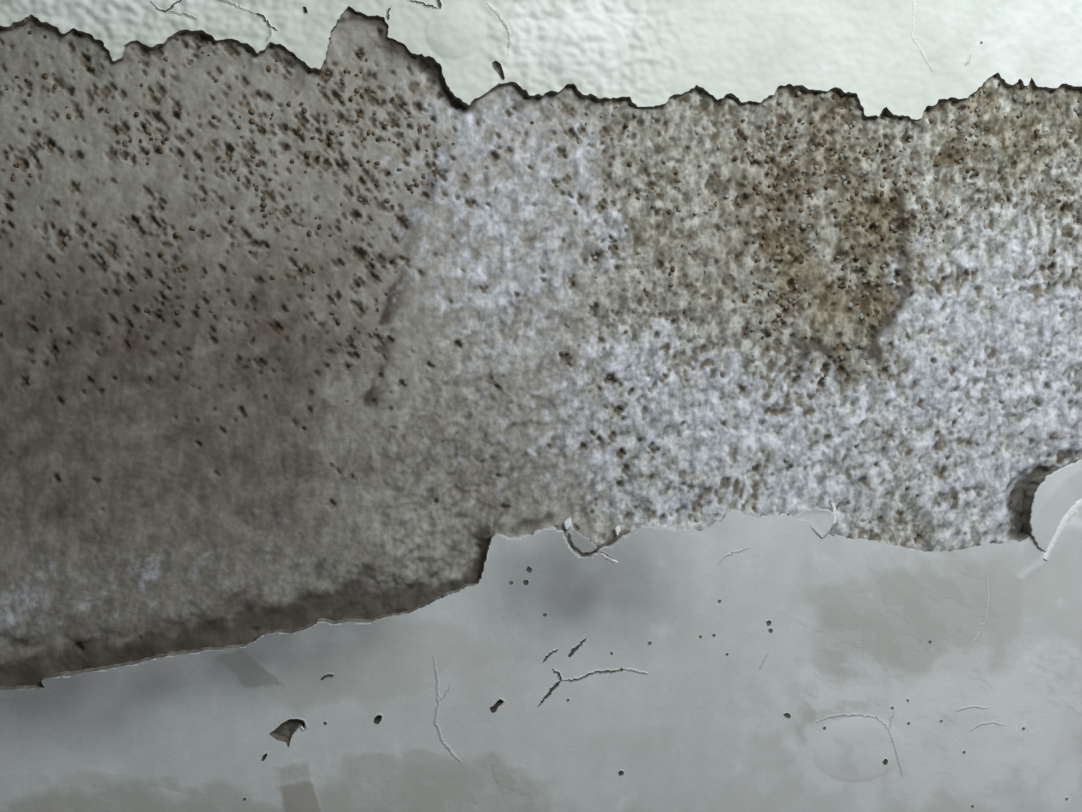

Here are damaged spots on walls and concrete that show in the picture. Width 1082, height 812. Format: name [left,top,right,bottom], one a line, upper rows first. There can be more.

flaking render [119,112,169,165]
flaking render [216,108,277,225]
flaking render [286,51,455,173]
flaking render [352,157,438,194]
peeling [492,61,506,82]
flaking render [563,97,618,126]
flaking render [626,187,743,217]
flaking render [732,82,1082,345]
damp [0,9,561,812]
damp [324,30,1082,697]
flaking render [1015,458,1082,583]
crack [537,636,649,707]